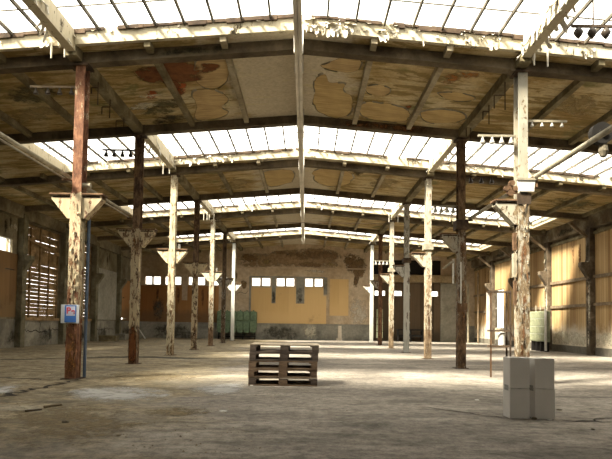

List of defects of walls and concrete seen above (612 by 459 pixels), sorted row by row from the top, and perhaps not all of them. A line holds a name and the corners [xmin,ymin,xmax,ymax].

peeling [303,16,371,38]
peeling [378,22,399,42]
corrosion [134,62,220,95]
spalling [191,59,229,121]
spalling [312,58,411,123]
spalling [263,169,295,187]
spalling [312,168,355,187]
peeling [516,204,531,329]
corrosion [128,318,136,363]